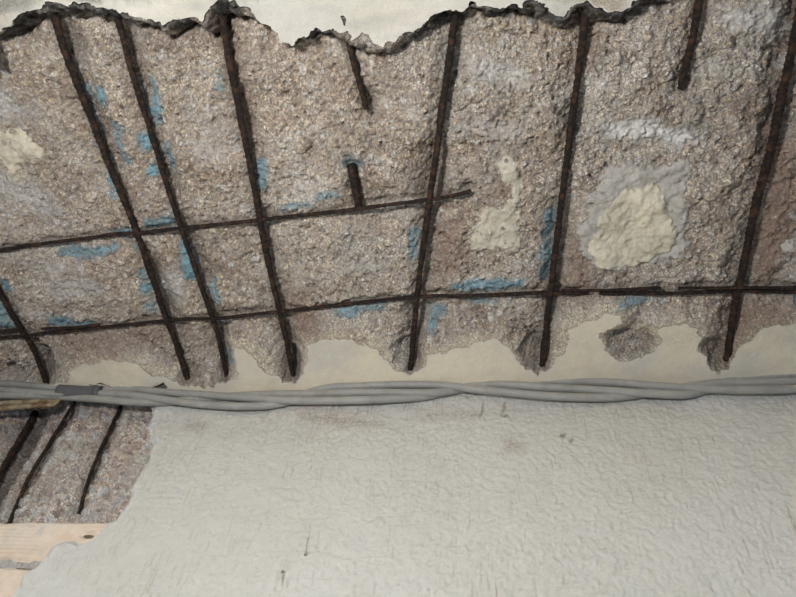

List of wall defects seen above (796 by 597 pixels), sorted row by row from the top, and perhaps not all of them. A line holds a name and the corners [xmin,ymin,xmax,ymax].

corrosion [0,0,796,384]
spalling [0,0,796,389]
corrosion [0,410,39,482]
corrosion [7,401,76,524]
spalling [0,399,153,524]
corrosion [77,405,122,515]